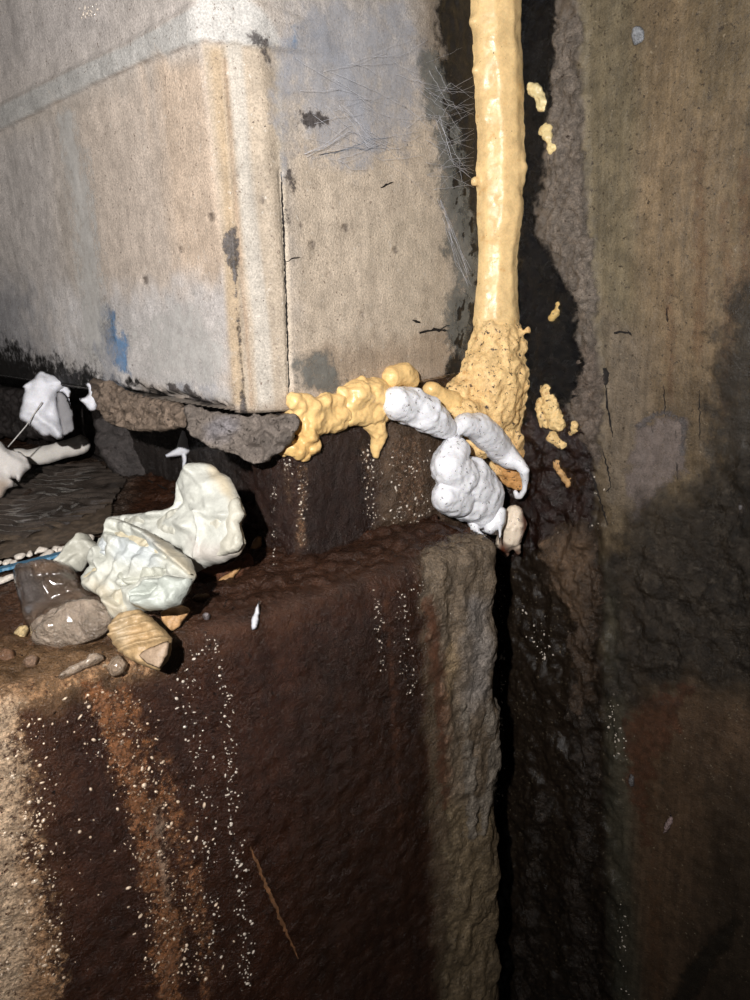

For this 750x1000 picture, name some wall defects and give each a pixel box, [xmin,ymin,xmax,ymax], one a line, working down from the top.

crack [280,172,300,392]
water stain [488,0,596,565]
water stain [0,655,150,1000]